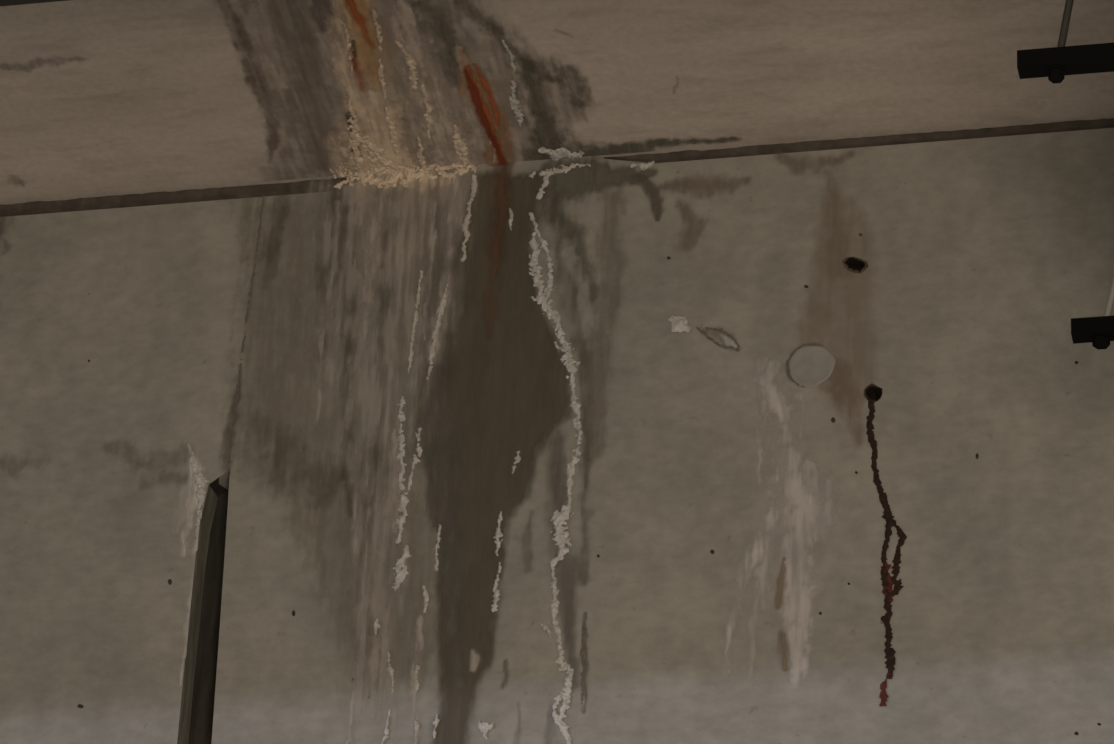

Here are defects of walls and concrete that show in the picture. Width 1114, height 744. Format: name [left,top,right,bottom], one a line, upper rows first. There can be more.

rust [460,63,512,276]
leakage [177,444,210,556]
leakage [245,0,749,744]
leakage [724,357,841,688]
crack [866,399,907,707]